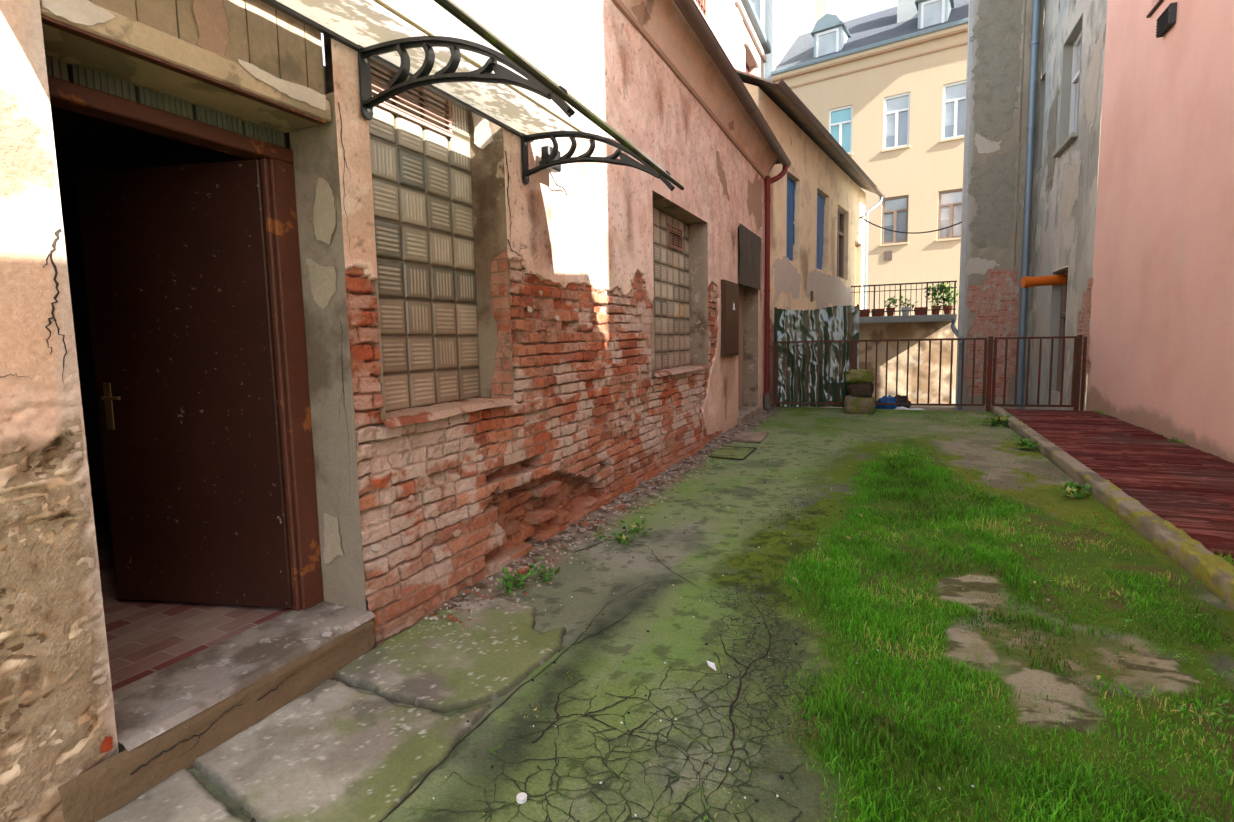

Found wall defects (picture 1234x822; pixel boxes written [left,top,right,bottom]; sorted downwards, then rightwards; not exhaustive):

crack [43,228,67,380]
peeling [313,177,336,245]
spalling [306,251,721,645]
spalling [963,0,1024,404]
spalling [1045,84,1081,228]
spalling [0,418,113,822]
crack [379,531,828,822]